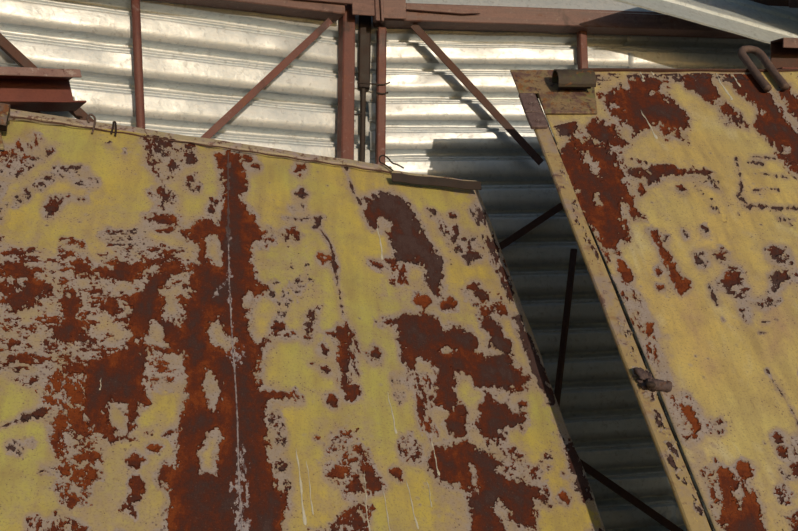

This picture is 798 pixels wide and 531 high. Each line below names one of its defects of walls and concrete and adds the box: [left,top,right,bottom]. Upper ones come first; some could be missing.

peeling [0,130,189,531]
peeling [136,134,205,216]
corrosion [78,149,306,531]
corrosion [305,499,376,531]
peeling [311,371,440,503]
peeling [424,200,490,266]
corrosion [359,189,559,531]
peeling [611,274,705,522]
corrosion [553,73,798,297]
peeling [692,244,753,323]
corrosion [699,456,766,531]
peeling [769,431,798,531]